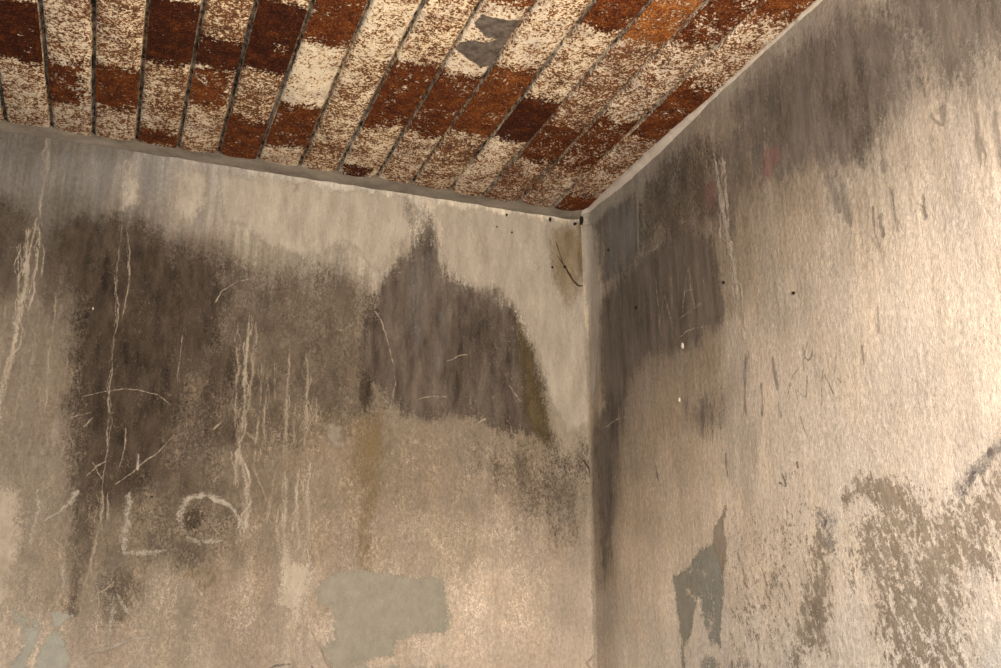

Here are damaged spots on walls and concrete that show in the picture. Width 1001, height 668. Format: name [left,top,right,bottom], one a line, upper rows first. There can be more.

corrosion [0,0,368,159]
peeling [456,14,521,67]
corrosion [487,0,535,14]
corrosion [362,59,719,172]
corrosion [582,0,816,50]
corrosion [341,163,376,177]
water stain [471,0,1001,567]
water stain [0,158,588,668]
peeling [673,457,1001,668]
peeling [8,609,75,668]
peeling [314,568,454,668]